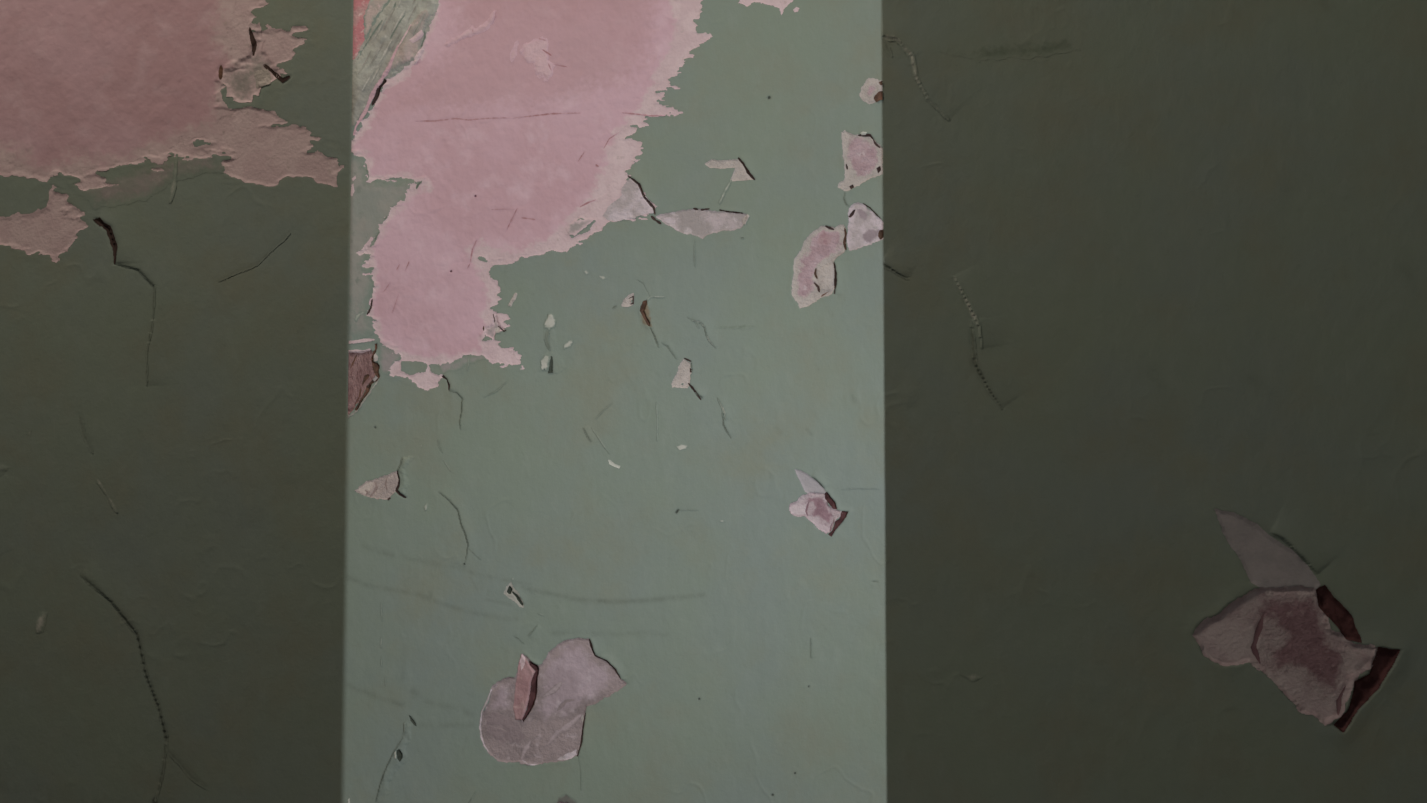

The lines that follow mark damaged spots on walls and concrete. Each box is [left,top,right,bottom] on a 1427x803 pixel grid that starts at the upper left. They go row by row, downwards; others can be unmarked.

peeling [739,0,799,15]
peeling [0,0,755,418]
peeling [791,130,884,308]
peeling [355,455,414,500]
peeling [789,469,848,537]
peeling [1192,509,1400,732]
peeling [479,638,629,803]